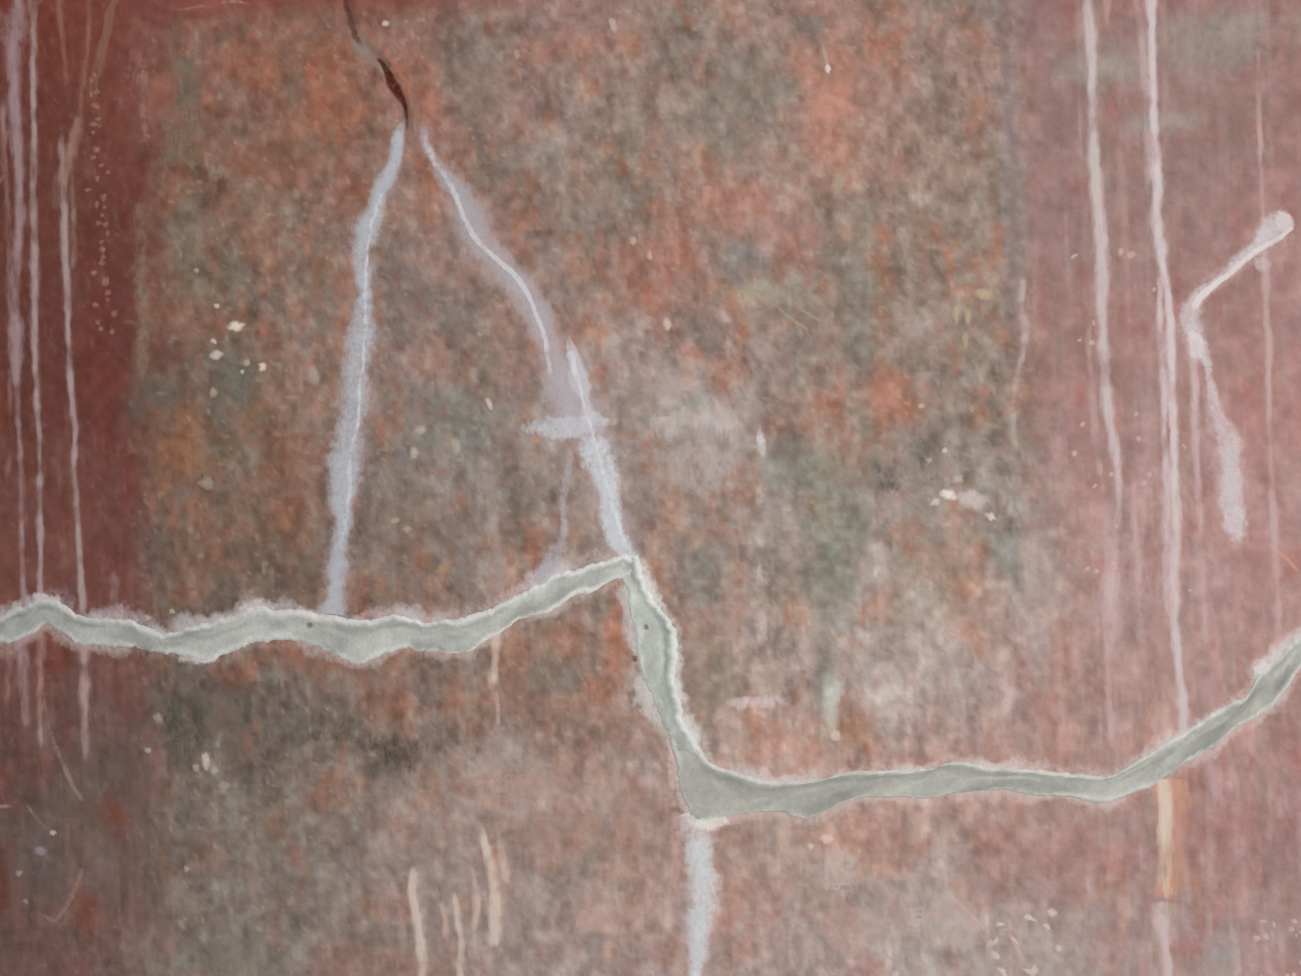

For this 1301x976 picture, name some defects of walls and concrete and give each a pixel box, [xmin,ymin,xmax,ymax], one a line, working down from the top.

crack [344,0,412,118]
leakage [1085,0,1107,115]
leakage [1,0,41,437]
leakage [62,202,74,344]
leakage [1089,131,1126,360]
leakage [67,367,77,466]
crack [0,131,1301,829]
leakage [1103,385,1120,491]
leakage [1140,0,1198,734]
leakage [20,515,43,607]
leakage [76,524,85,612]
crack [686,837,722,976]